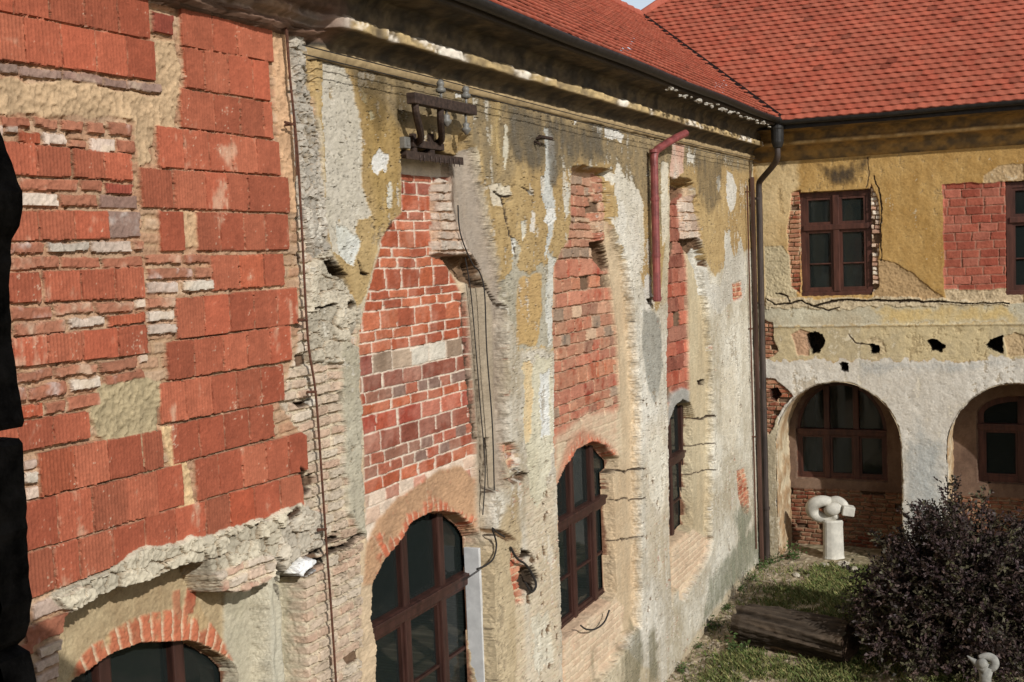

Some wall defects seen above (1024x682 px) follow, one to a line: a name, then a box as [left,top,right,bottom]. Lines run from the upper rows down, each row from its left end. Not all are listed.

peeling [660,143,748,314]
hole [440,254,482,288]
spalling [764,184,1009,359]
crack [767,292,1010,311]
flaking render [766,378,793,434]
crack [681,414,717,475]
crack [599,467,647,501]
crack [602,534,644,542]
flaking render [480,527,630,682]